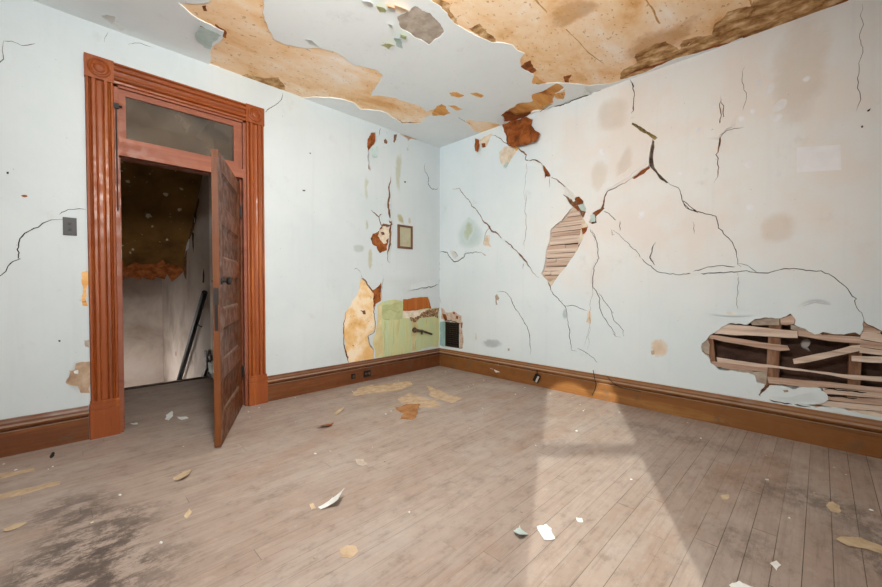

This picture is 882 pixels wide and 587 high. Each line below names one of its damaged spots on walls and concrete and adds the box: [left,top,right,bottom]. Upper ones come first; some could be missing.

peeling [195,26,221,49]
flaking render [362,1,444,49]
damp [544,0,607,31]
damp [614,5,712,68]
damp [761,5,846,144]
crack [0,208,81,276]
flaking render [371,226,389,253]
crack [424,135,573,273]
flaking render [563,186,604,247]
crack [550,73,865,361]
peeling [343,278,463,363]
flaking render [66,362,90,393]